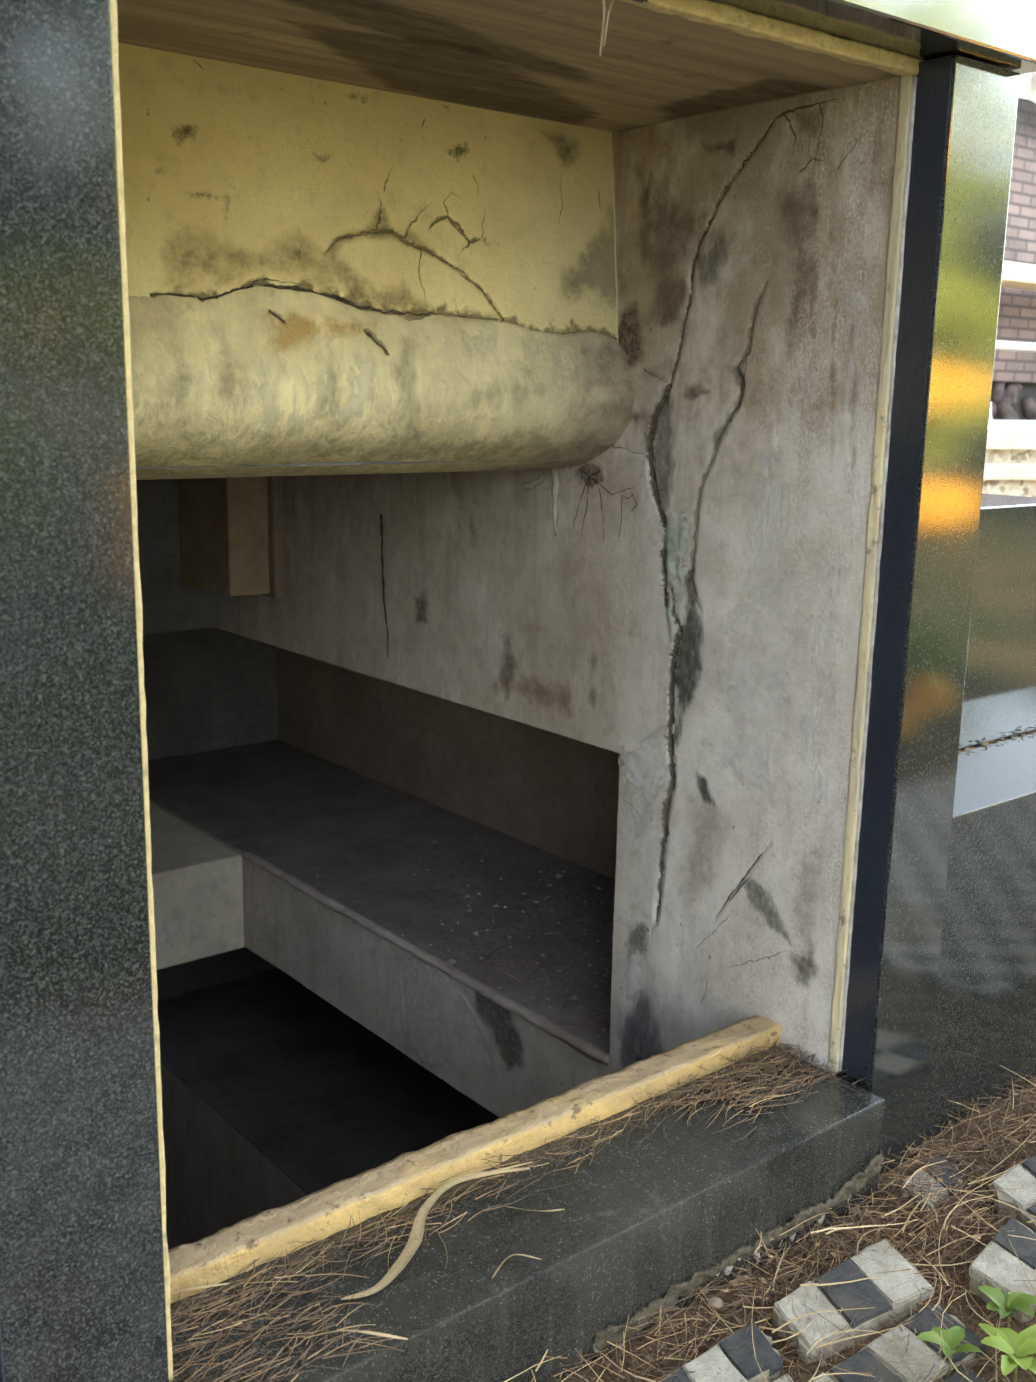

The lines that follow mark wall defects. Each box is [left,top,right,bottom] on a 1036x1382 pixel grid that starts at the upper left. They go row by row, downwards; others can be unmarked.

crack [150,168,617,356]
crack [573,98,862,922]
crack [380,514,389,658]
damp [395,950,522,1068]
damp [622,925,660,1067]